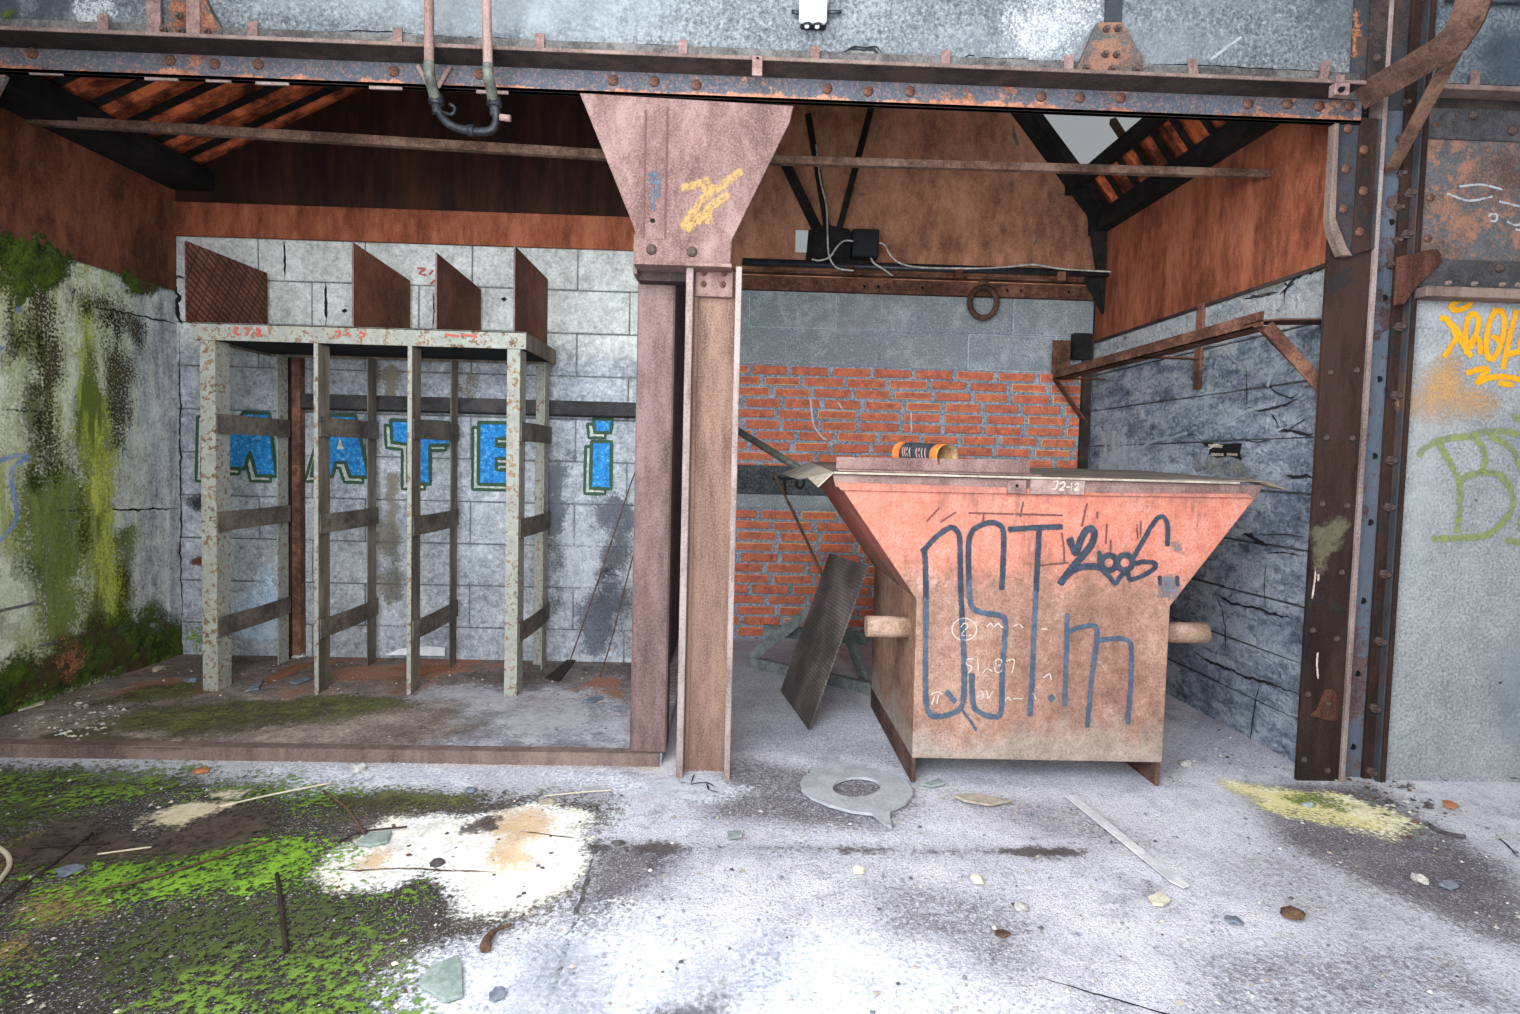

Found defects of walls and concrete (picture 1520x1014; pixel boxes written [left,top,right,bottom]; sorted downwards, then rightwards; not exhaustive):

crack [1244,268,1324,305]
water stain [0,270,150,483]
crack [1244,370,1313,443]
crack [1287,472,1312,480]